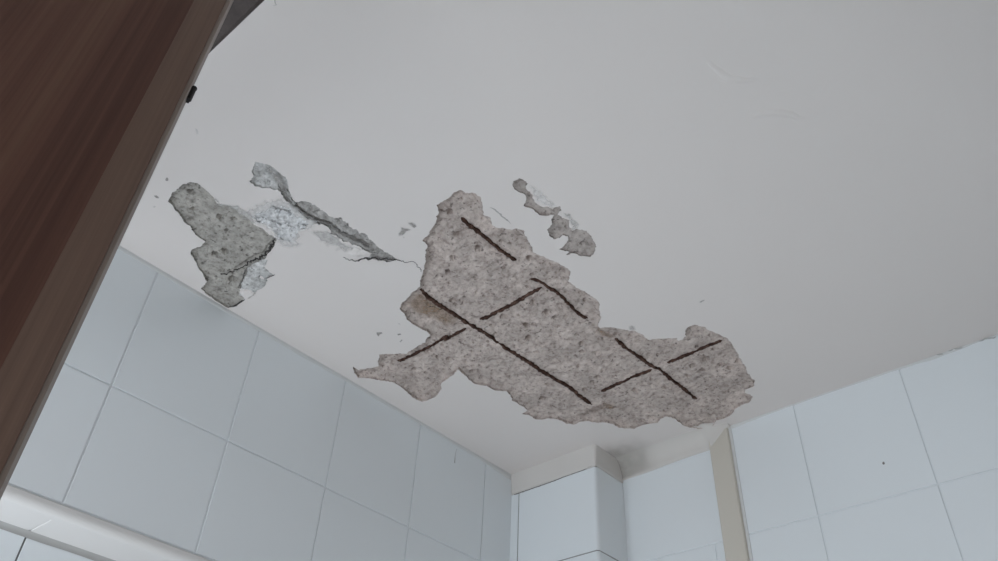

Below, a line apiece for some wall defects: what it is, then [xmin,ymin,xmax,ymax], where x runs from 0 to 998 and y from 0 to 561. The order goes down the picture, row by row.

spalling [156,182,313,308]
crack [249,162,421,270]
spalling [353,178,755,429]